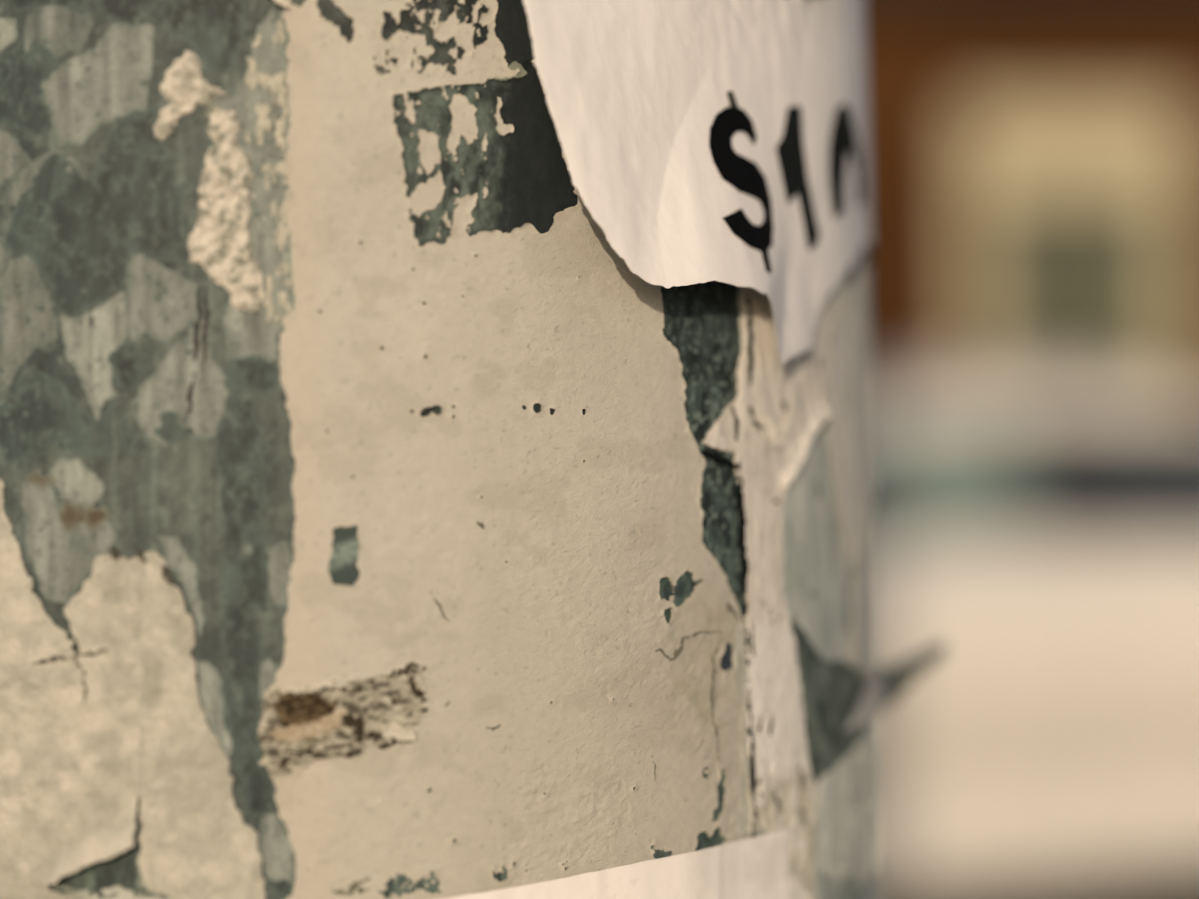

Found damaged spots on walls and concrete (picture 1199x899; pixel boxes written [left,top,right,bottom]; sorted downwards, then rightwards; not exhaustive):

peeling [245,20,292,324]
peeling [291,0,354,43]
peeling [373,0,578,247]
peeling [659,281,745,624]
crack [746,296,754,387]
peeling [0,479,266,899]
peeling [278,680,353,694]
spalling [651,845,672,859]
crack [655,450,756,838]
spalling [695,767,727,851]
spalling [720,643,733,671]
peeling [781,422,867,783]